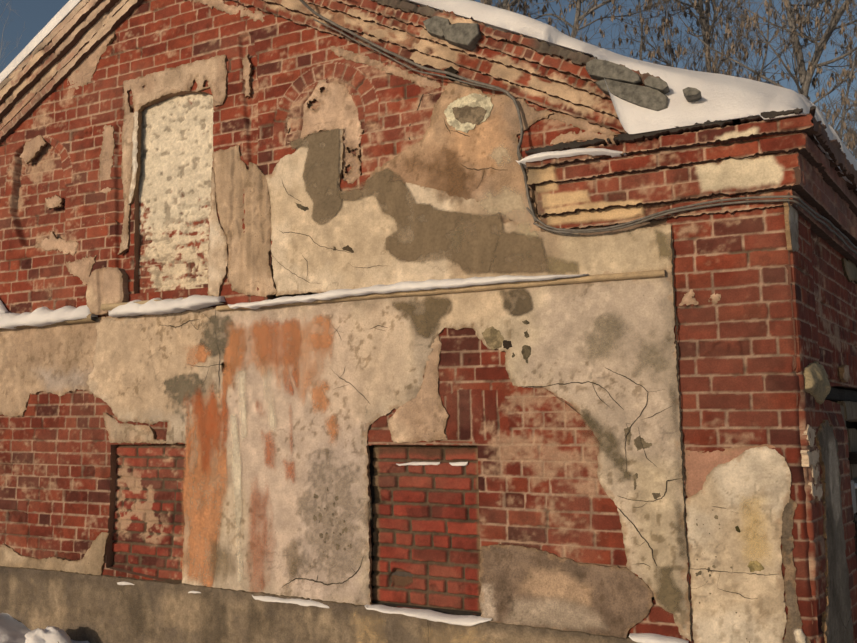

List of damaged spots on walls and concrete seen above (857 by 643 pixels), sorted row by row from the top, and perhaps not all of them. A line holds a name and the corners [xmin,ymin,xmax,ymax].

peeling [0,0,503,314]
leakage [393,298,451,338]
leakage [290,128,578,274]
leakage [502,289,533,316]
peeling [517,100,621,158]
leakage [656,231,671,257]
peeling [0,389,184,581]
leakage [164,374,203,413]
rust [183,316,336,587]
peeling [367,320,642,579]
crack [521,230,776,643]
crack [284,556,364,586]